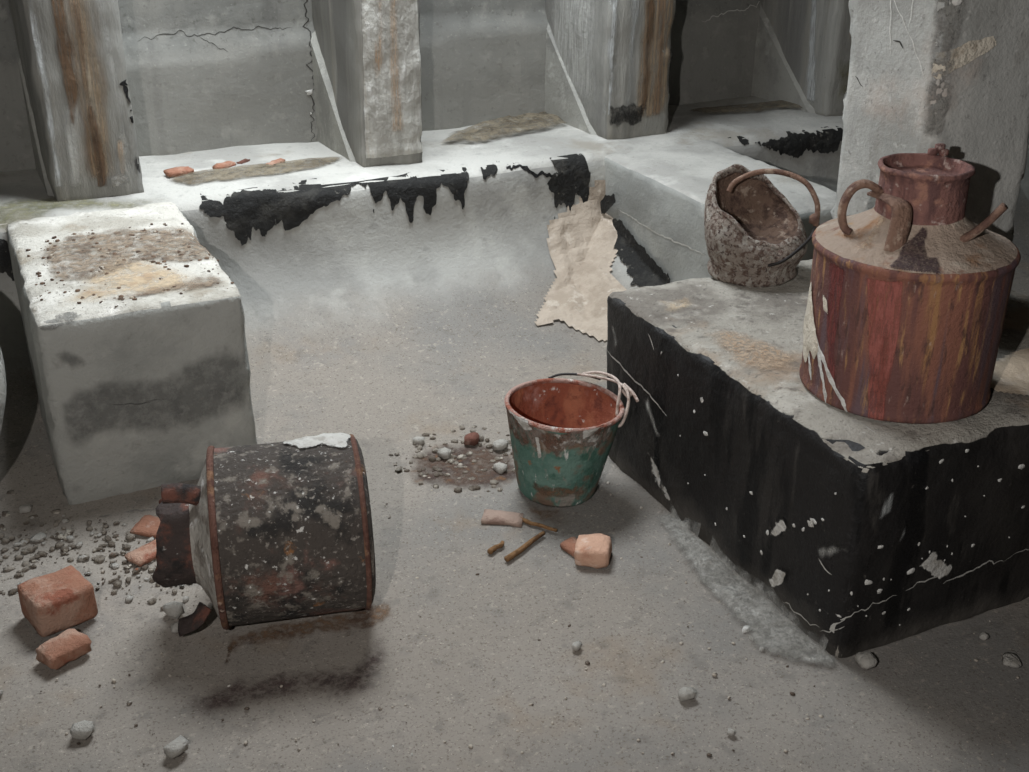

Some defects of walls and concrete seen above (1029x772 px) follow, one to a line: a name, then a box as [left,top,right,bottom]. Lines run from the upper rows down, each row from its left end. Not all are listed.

rust [52,0,123,187]
crack [139,0,315,141]
rust [638,0,673,116]
spalling [926,0,964,134]
peeling [481,161,558,180]
damp [67,359,242,437]
crack [783,549,1029,633]